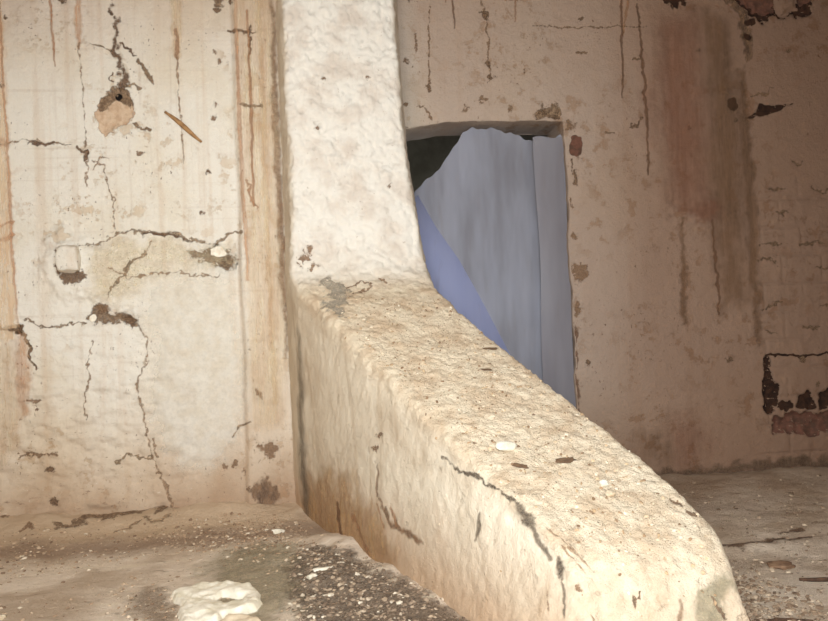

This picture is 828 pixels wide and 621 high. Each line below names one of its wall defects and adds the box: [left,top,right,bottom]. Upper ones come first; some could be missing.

crack [93,3,154,90]
spalling [724,0,812,61]
spalling [94,86,152,137]
rust [246,10,256,206]
crack [0,139,242,299]
peeling [296,245,315,272]
peeling [320,277,387,318]
crack [0,318,94,418]
crack [54,325,174,532]
spalling [257,442,278,463]
spalling [762,357,828,437]
crack [441,456,588,616]